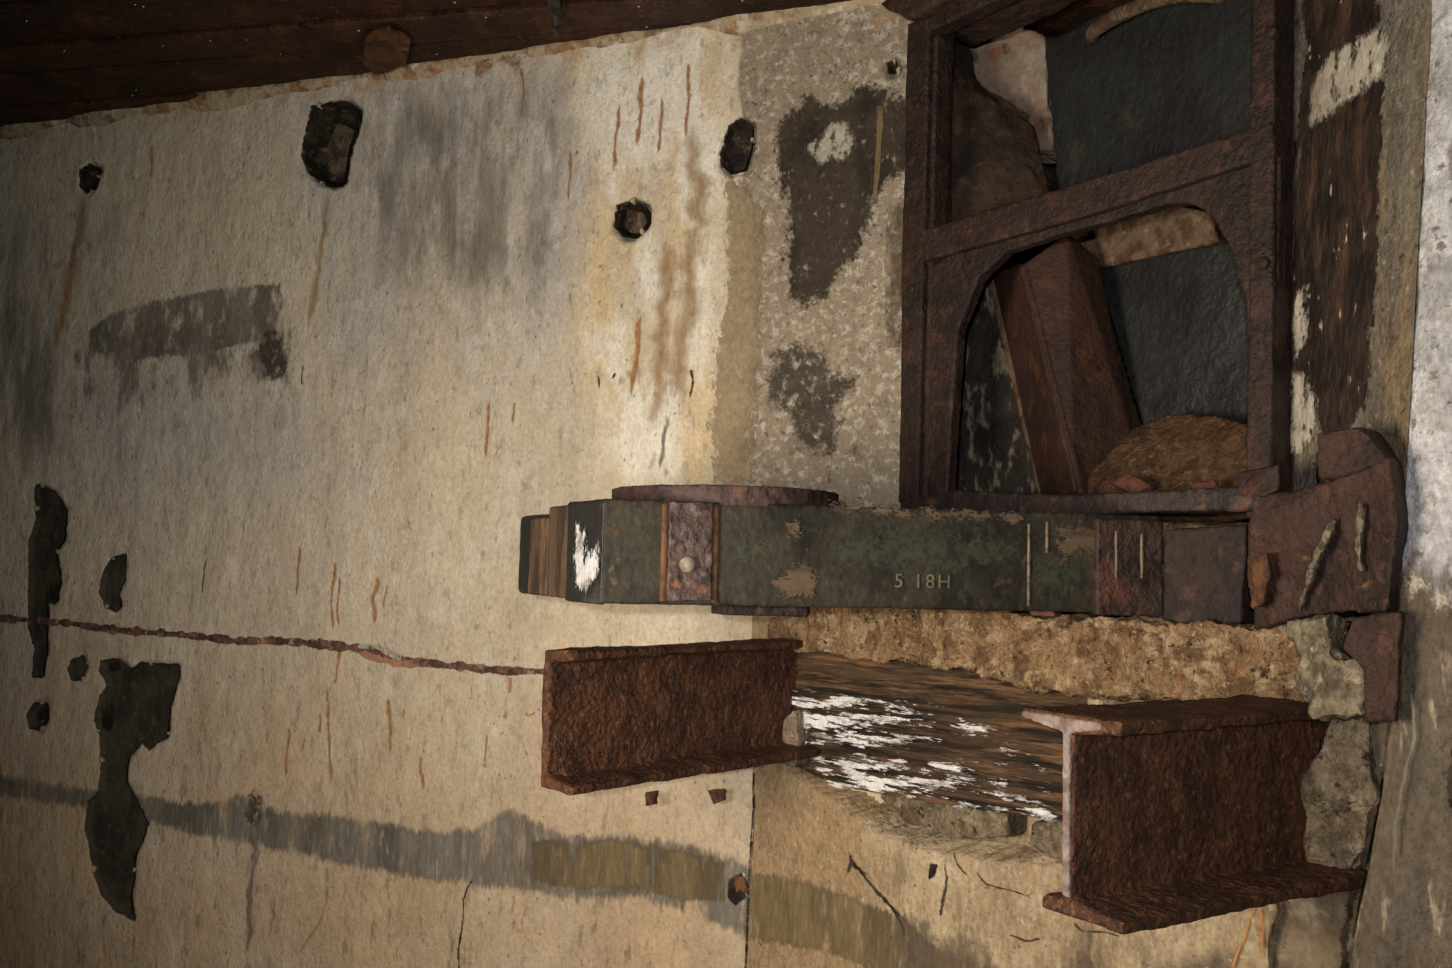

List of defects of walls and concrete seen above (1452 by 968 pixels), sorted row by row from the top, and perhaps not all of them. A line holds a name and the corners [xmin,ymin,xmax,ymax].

hole [301,100,363,187]
rust [613,79,663,165]
water stain [1309,27,1392,126]
water stain [772,83,906,352]
rust [656,151,702,405]
rust [630,321,640,393]
efflorescence [1290,370,1316,454]
spalling [27,482,68,678]
crack [0,614,544,676]
spalling [26,698,49,732]
spalling [67,655,180,921]
water stain [133,793,989,968]